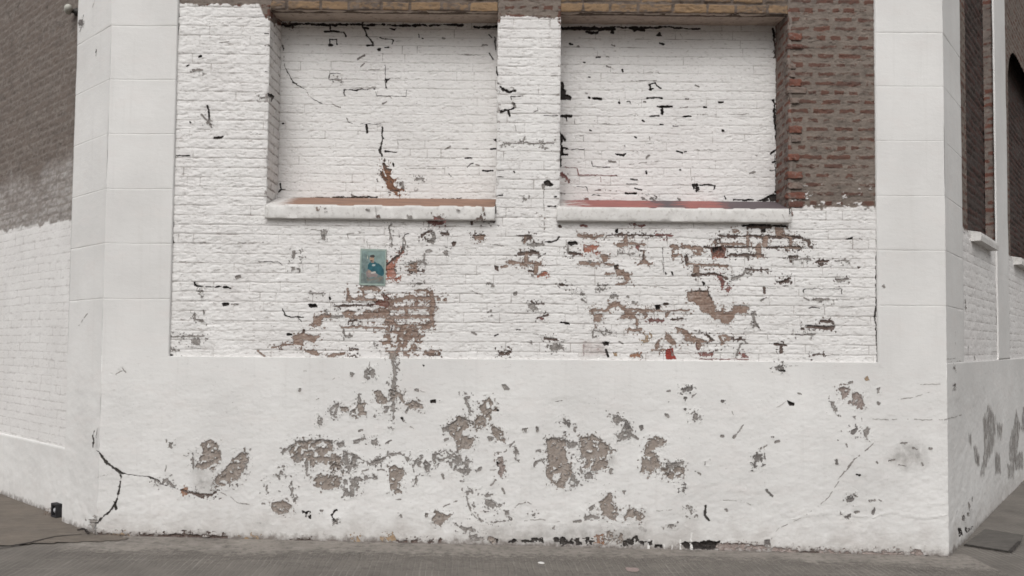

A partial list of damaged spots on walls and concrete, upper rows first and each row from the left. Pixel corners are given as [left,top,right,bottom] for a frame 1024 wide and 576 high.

peeling [469,207,860,361]
crack [2,430,248,547]
spalling [166,439,253,491]
spalling [386,384,706,548]
spalling [828,376,880,447]
peeling [970,407,1024,478]